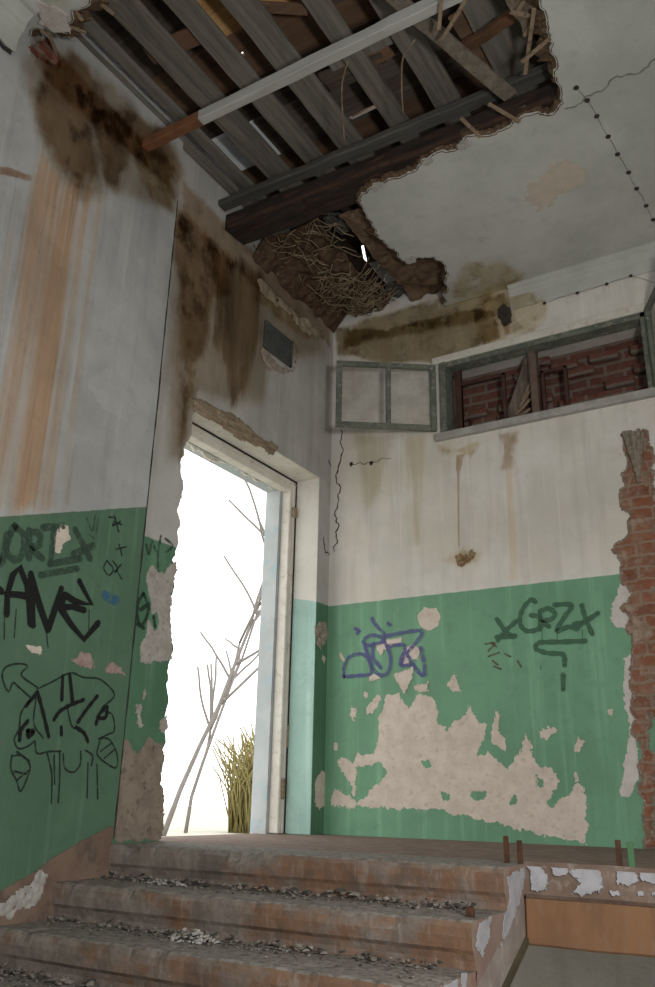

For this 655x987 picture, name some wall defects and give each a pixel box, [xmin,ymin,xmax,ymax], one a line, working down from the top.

crack [0,41,12,55]
spalling [29,0,110,70]
leakage [70,87,143,158]
spalling [355,0,563,305]
crack [564,58,655,223]
crack [323,429,389,555]
peeling [140,561,178,664]
peeling [417,607,441,631]
flaking render [607,428,655,849]
peeling [314,637,589,846]
peeling [0,715,168,926]
peeling [475,866,655,957]